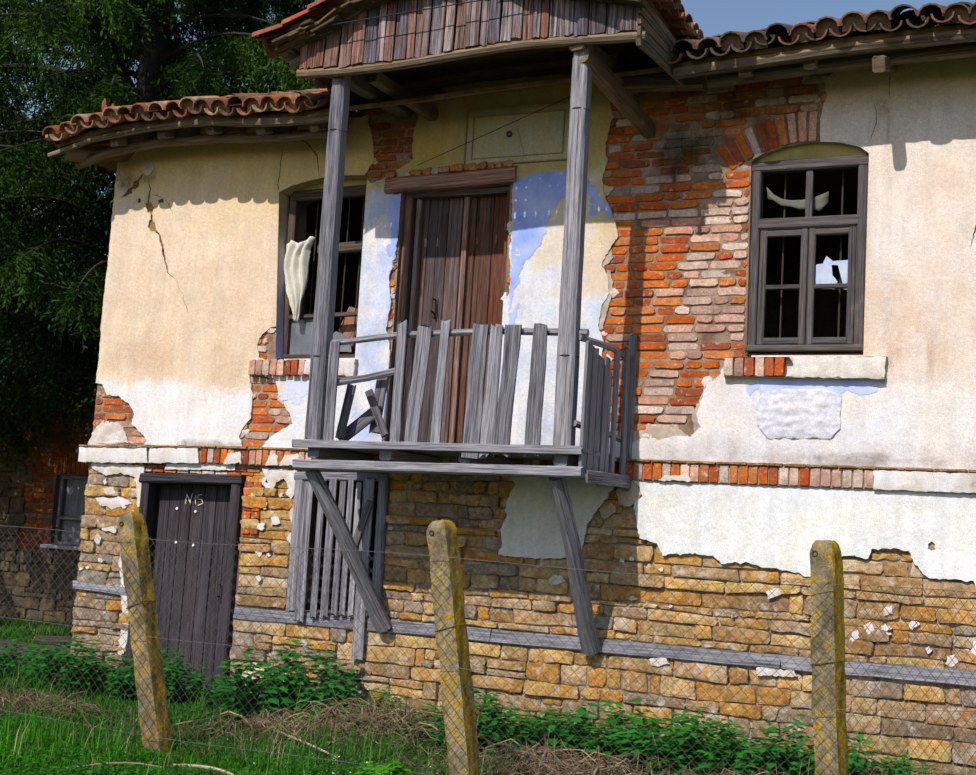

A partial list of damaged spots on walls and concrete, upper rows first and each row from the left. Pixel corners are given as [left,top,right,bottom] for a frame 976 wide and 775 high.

crack [125,181,164,247]
spalling [357,102,419,183]
peeling [501,170,567,328]
spalling [587,72,833,442]
peeling [77,462,146,657]
spalling [88,383,147,446]
peeling [200,375,320,608]
spalling [258,327,284,360]
peeling [382,473,578,635]
peeling [582,462,874,657]
peeling [756,667,798,677]
peeling [842,548,976,671]